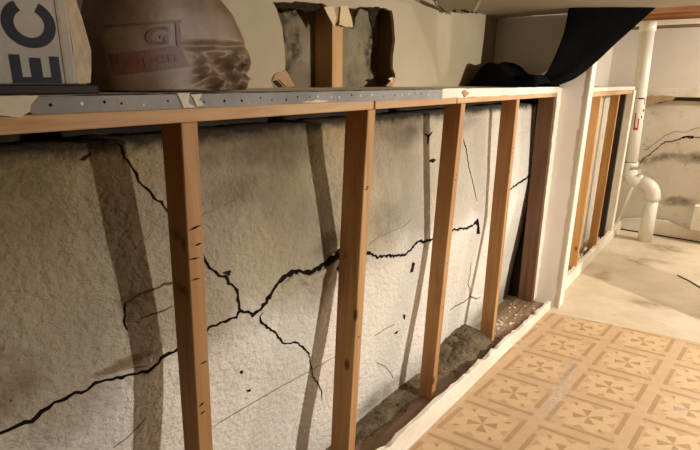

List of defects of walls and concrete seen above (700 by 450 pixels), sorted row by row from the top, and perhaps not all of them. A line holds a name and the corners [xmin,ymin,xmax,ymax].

crack [119,144,167,211]
crack [463,139,477,200]
crack [640,128,700,164]
crack [367,218,433,259]
crack [452,221,478,231]
crack [123,282,173,331]
crack [203,252,340,426]
crack [0,348,177,435]